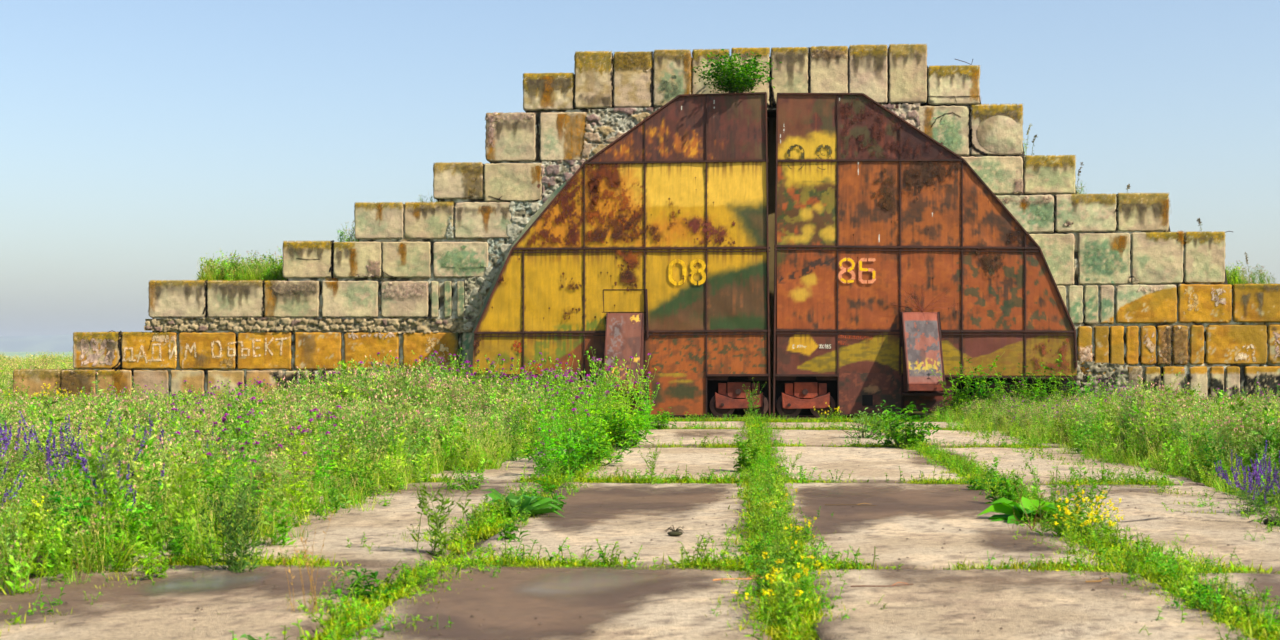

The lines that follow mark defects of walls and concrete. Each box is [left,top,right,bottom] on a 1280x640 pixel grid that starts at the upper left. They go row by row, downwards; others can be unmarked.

damp [528,78,612,104]
damp [496,121,533,135]
corrosion [924,108,933,138]
corrosion [521,76,735,291]
corrosion [872,162,961,222]
damp [185,284,257,303]